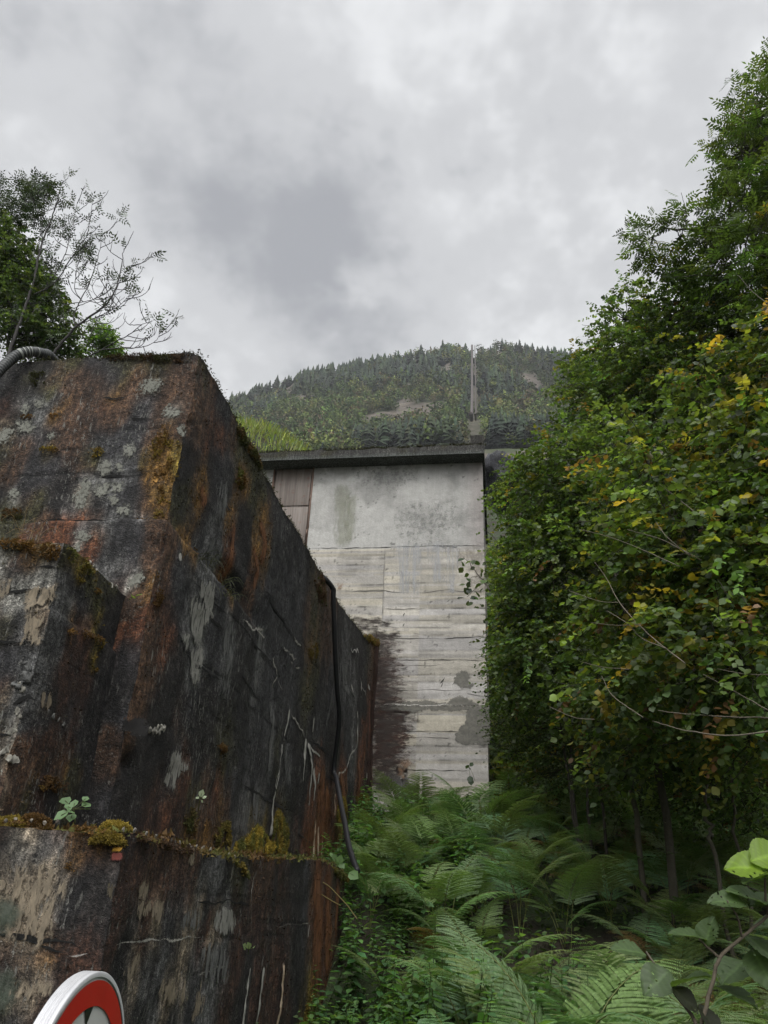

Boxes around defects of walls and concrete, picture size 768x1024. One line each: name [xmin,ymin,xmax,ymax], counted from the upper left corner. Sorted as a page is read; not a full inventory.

peeling [20,584,57,645]
peeling [182,580,236,700]
damp [268,633,490,836]